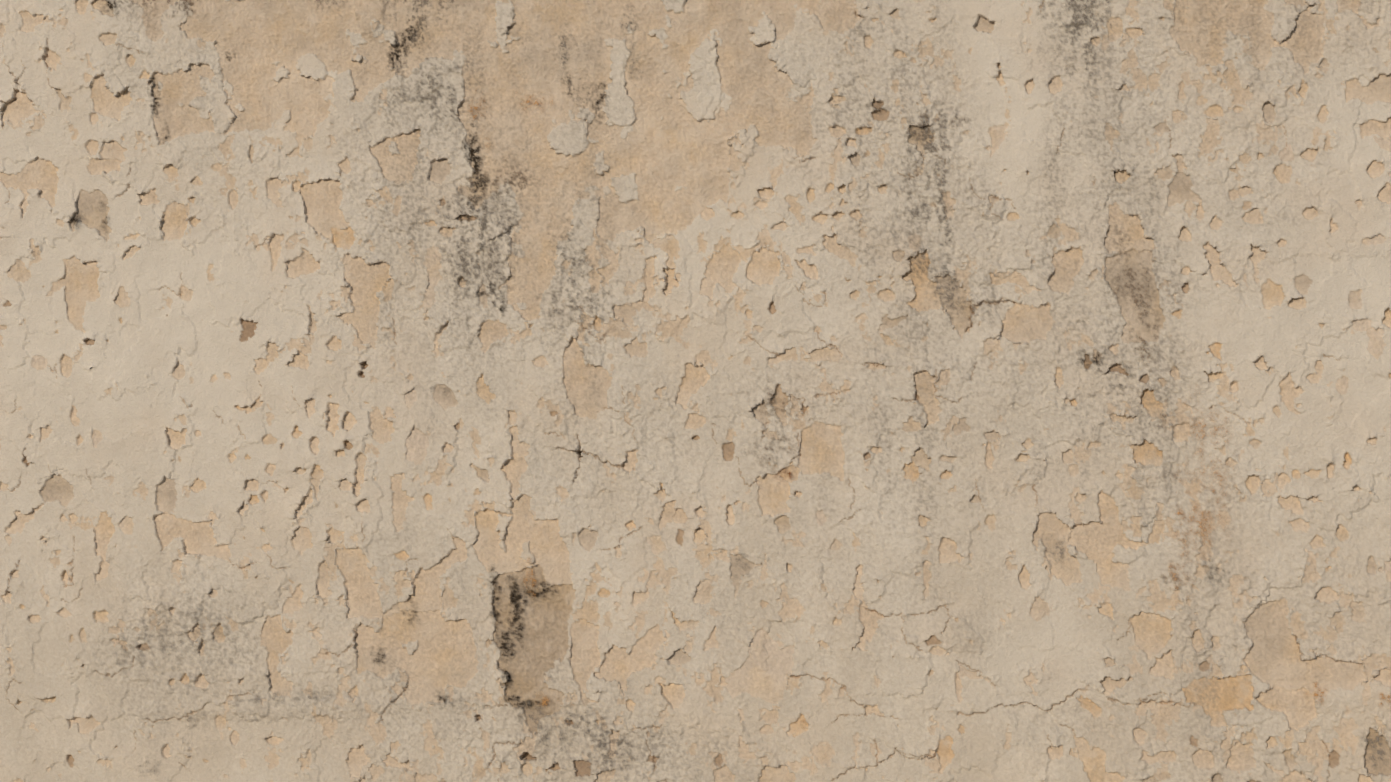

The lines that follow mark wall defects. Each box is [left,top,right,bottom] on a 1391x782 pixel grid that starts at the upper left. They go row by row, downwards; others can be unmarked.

damp [403,69,455,116]
damp [448,135,526,295]
peeling [0,415,273,592]
peeling [186,617,238,656]
damp [490,568,556,718]
peeling [236,327,850,782]
peeling [821,532,890,650]
peeling [63,710,102,735]
spalling [686,706,882,782]